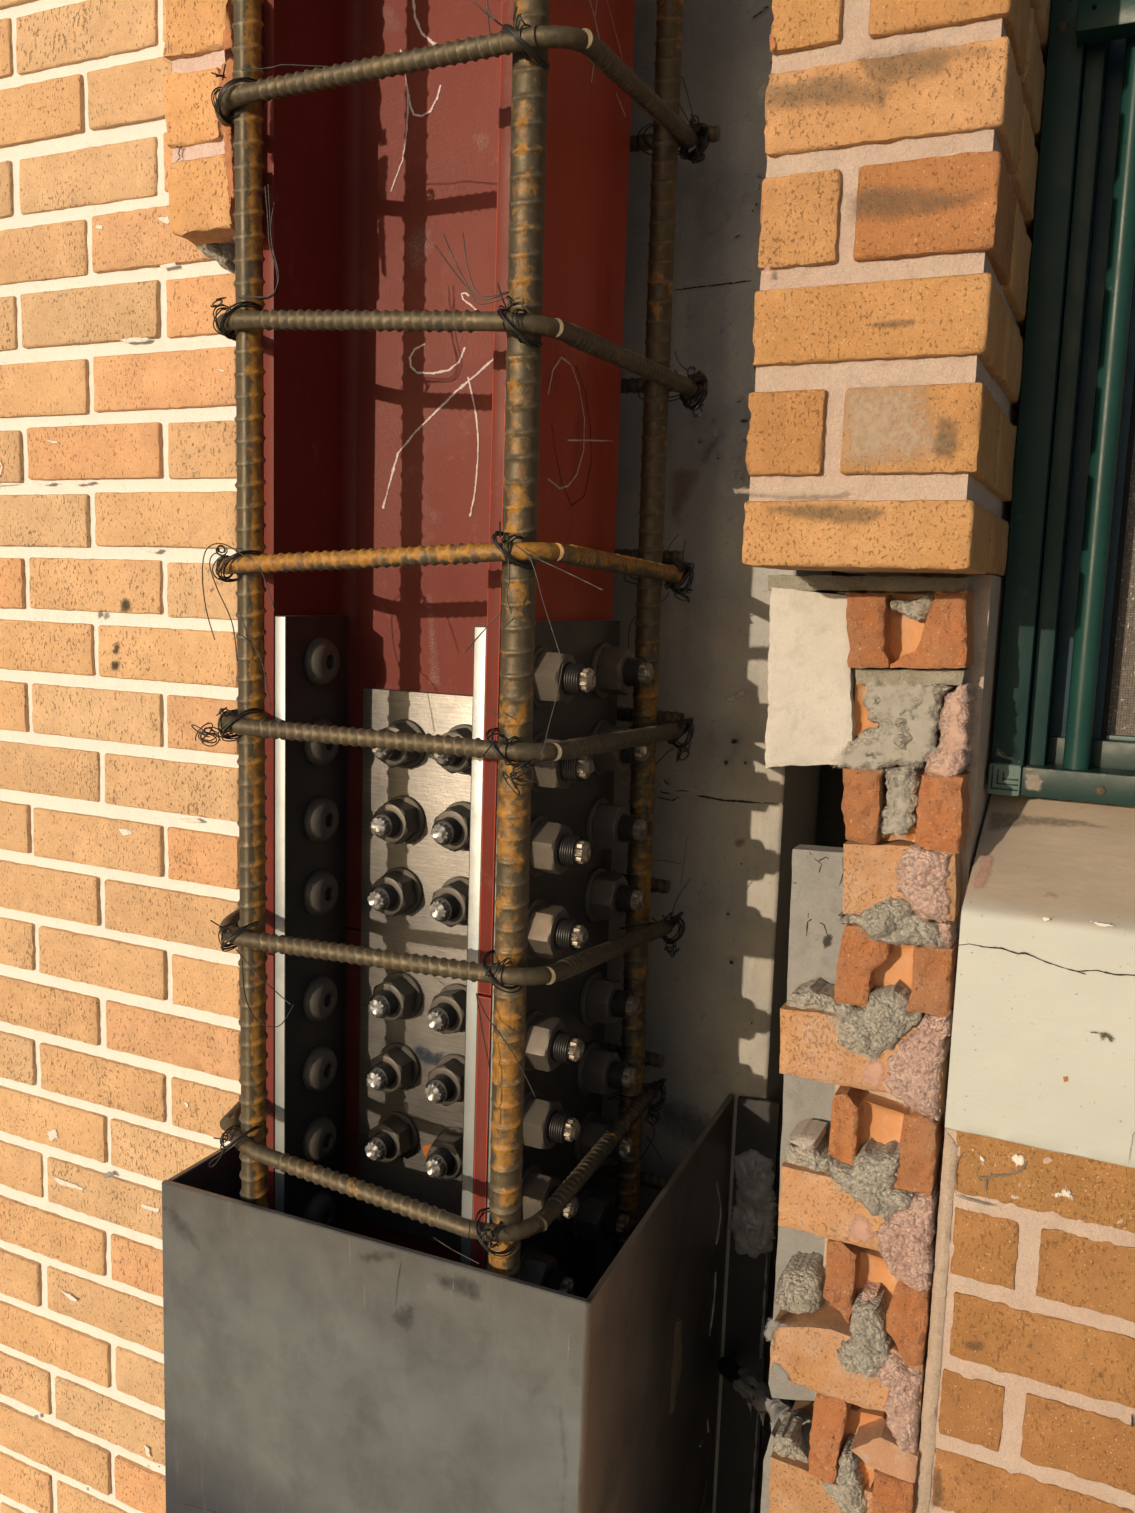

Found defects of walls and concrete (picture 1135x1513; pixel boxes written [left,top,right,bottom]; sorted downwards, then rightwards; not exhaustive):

spalling [846,591,974,669]
spalling [841,766,888,845]
spalling [915,770,971,854]
spalling [823,924,894,1007]
spalling [908,937,959,1016]
crack [950,944,1135,976]